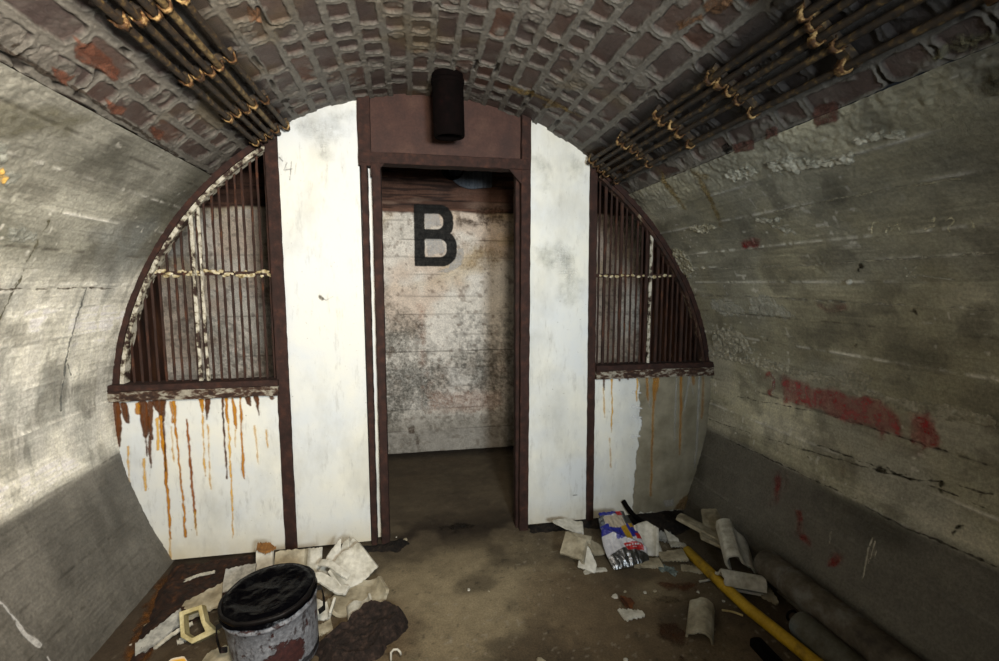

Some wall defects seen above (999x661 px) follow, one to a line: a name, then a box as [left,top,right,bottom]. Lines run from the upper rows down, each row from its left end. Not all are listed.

flaking render [722,140,755,154]
flaking render [813,101,839,128]
crack [0,220,112,411]
rust [113,396,274,539]
rust [603,377,659,489]